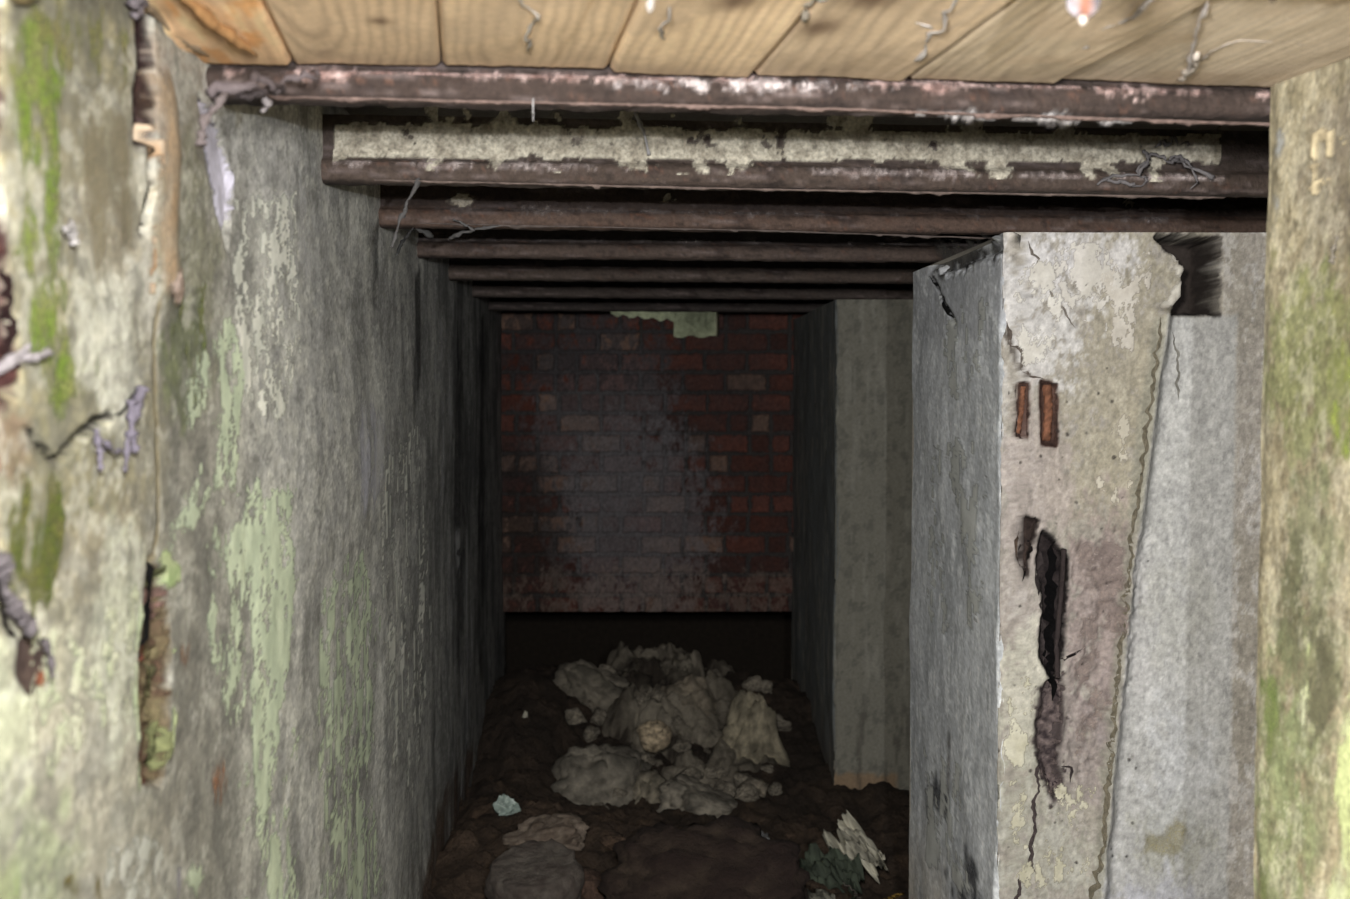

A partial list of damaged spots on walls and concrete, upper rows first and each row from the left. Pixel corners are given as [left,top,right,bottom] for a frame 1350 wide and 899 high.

spalling [132,16,166,172]
peeling [397,159,473,169]
peeling [509,162,585,173]
corrosion [0,241,22,401]
crack [22,305,159,558]
peeling [15,101,302,899]
peeling [317,426,432,899]
crack [1014,517,1082,703]
spalling [1003,541,1129,889]
crack [1088,317,1180,899]
crack [1014,751,1041,899]